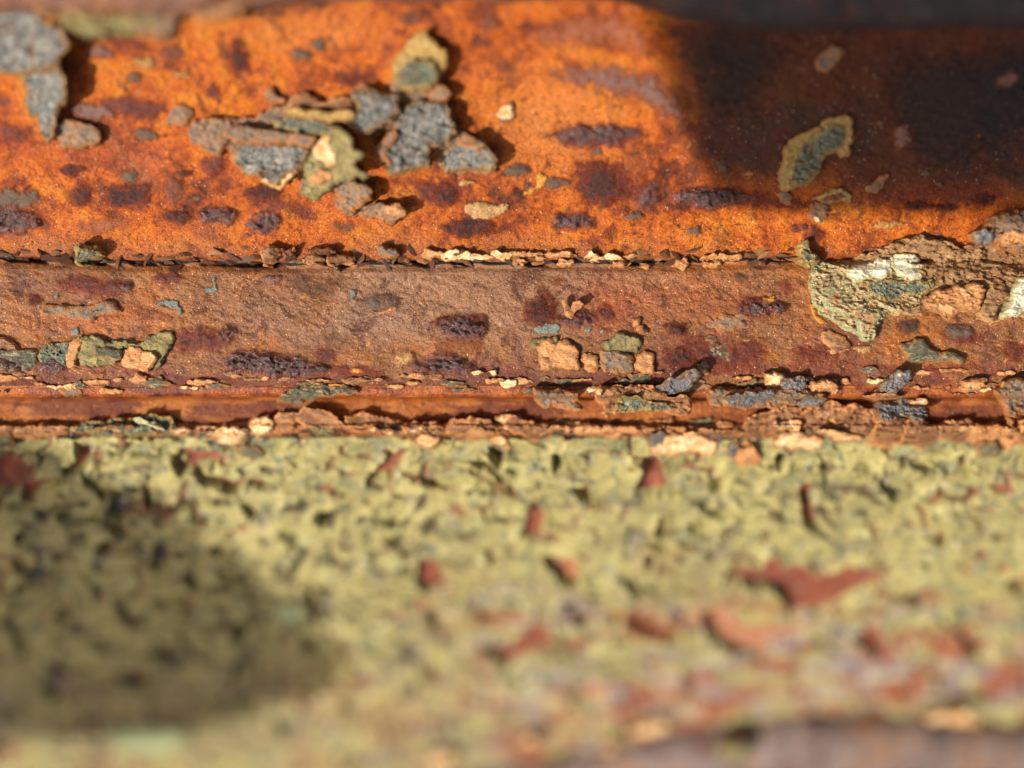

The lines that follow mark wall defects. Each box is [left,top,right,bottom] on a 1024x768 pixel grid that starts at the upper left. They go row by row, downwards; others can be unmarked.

peeling [0,3,252,145]
rust [55,96,194,190]
peeling [162,10,757,250]
rust [387,172,547,219]
peeling [776,115,855,192]
rust [175,327,384,382]
peeling [0,287,713,406]
rust [419,247,651,285]
rust [681,280,840,394]
peeling [810,254,939,354]
rust [796,209,1024,362]
peeling [997,277,1024,319]